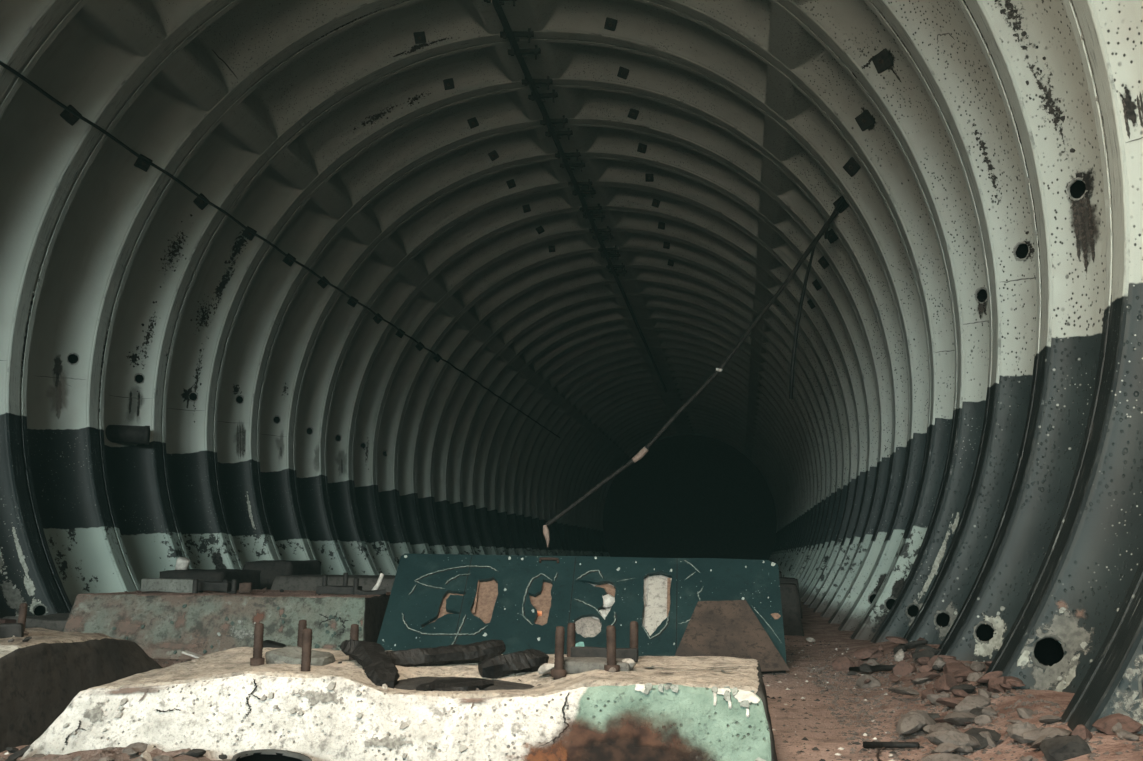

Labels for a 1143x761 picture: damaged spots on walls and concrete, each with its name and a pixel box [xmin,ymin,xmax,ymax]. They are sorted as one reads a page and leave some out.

peeling [0,522,48,616]
spalling [211,551,227,569]
peeling [868,512,959,641]
spalling [973,606,1007,659]
spalling [1017,601,1094,692]
crack [245,679,267,717]
corrosion [524,712,714,761]
spalling [1109,654,1143,734]